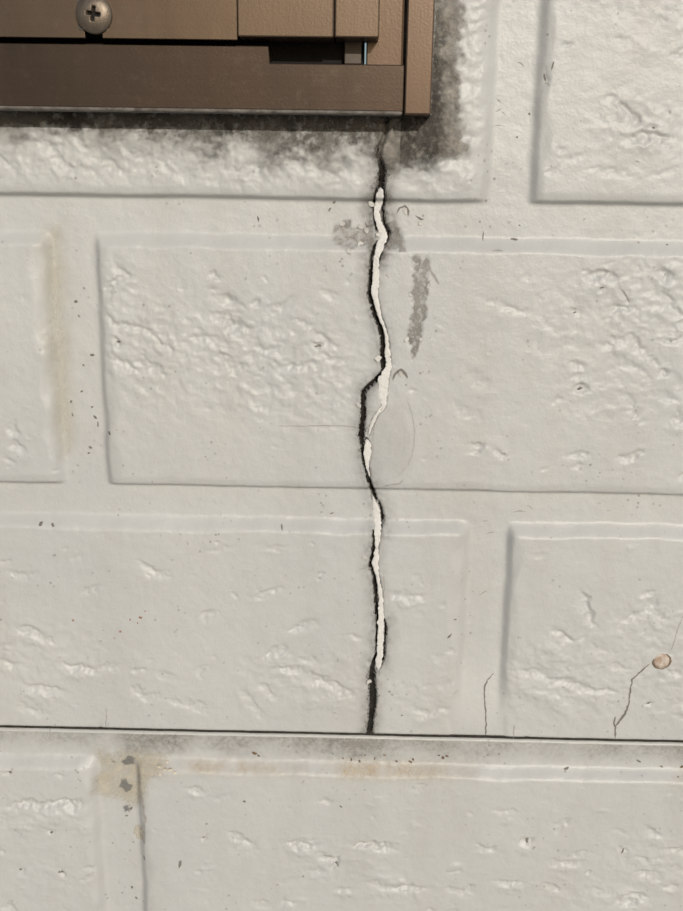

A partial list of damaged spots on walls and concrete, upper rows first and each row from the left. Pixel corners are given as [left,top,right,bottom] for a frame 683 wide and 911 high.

leakage [0,111,418,155]
crack [281,116,404,733]